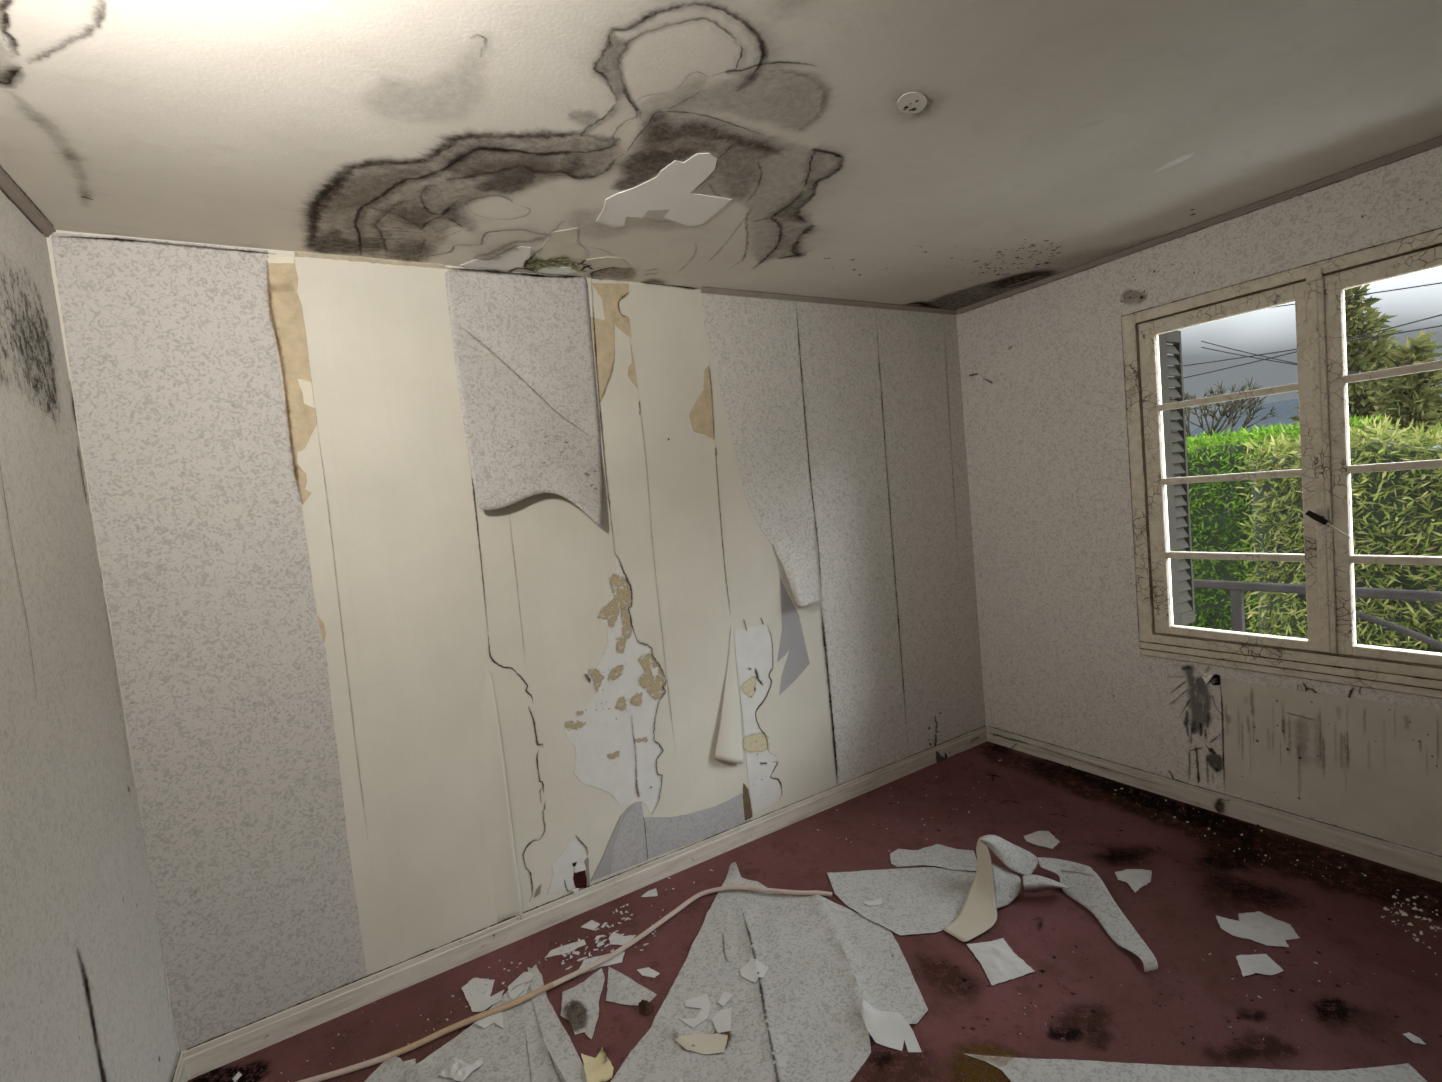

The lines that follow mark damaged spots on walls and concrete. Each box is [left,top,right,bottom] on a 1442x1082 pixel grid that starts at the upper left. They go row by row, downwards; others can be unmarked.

leakage [594,4,765,80]
leakage [0,271,57,421]
peeling [267,256,317,505]
leakage [309,87,770,255]
peeling [689,366,714,440]
leakage [741,149,842,264]
leakage [907,239,1061,310]
spalling [534,556,666,898]
spalling [715,619,782,814]
leakage [1172,667,1223,782]
leakage [1035,760,1442,926]
crack [79,955,106,1082]